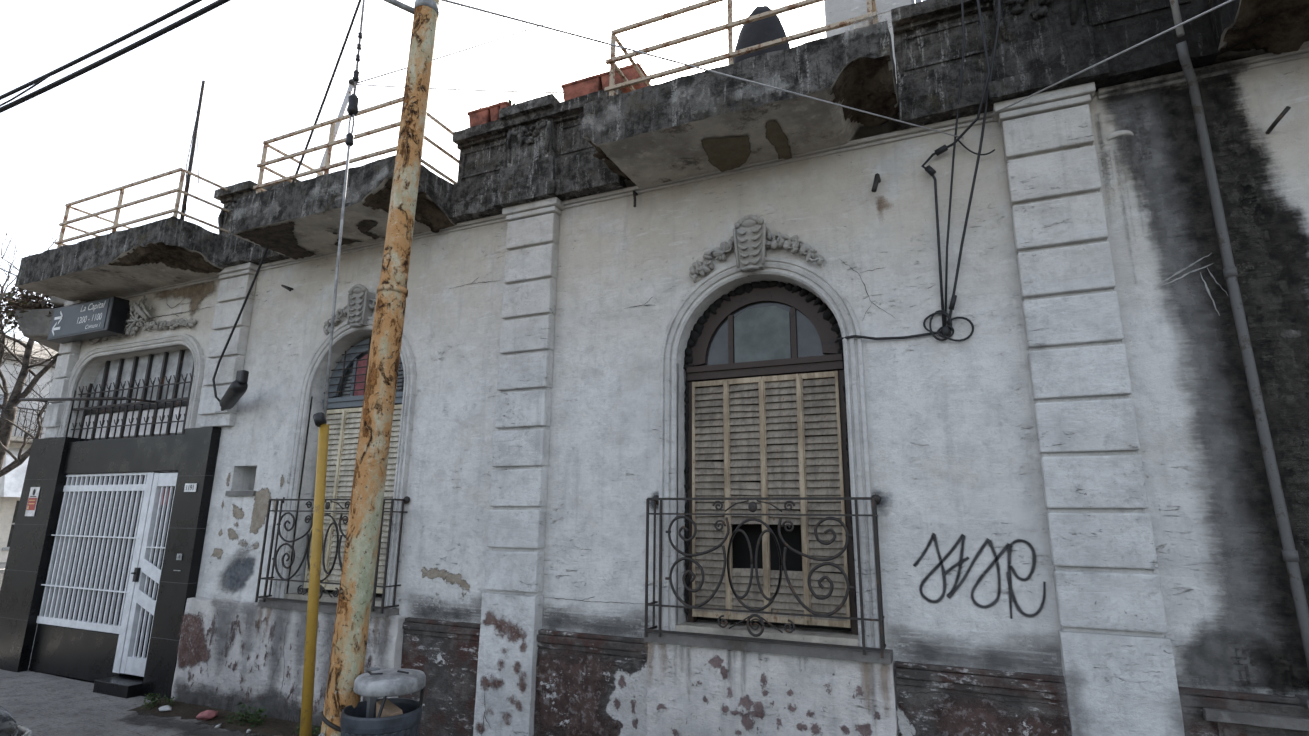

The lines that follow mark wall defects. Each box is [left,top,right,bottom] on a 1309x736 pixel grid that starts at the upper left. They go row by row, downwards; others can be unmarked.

spalling [1217,0,1309,56]
spalling [830,56,898,127]
spalling [333,177,393,246]
spalling [415,192,454,233]
spalling [108,242,222,274]
damp [1105,60,1309,696]
peeling [212,475,284,560]
damp [214,549,256,662]
peeling [176,612,299,704]
damp [322,613,336,697]
peeling [476,612,667,736]
peeling [690,655,834,735]